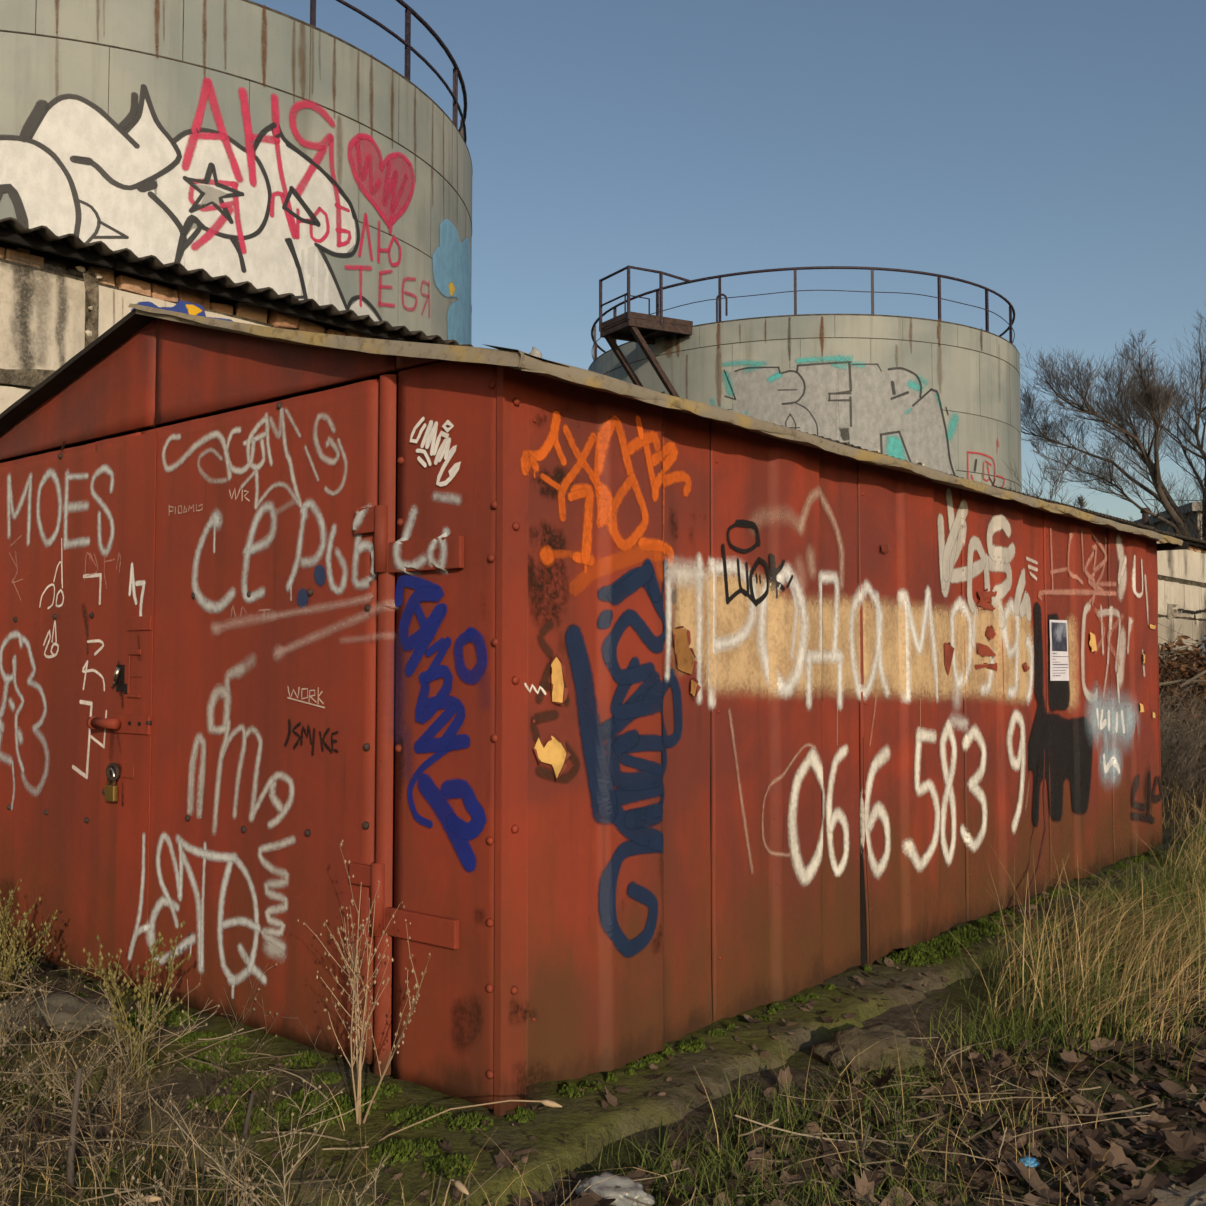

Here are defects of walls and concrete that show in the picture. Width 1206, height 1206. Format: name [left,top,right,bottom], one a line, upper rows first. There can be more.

damp [2,257,75,369]
rust [538,468,567,497]
rust [528,525,565,622]